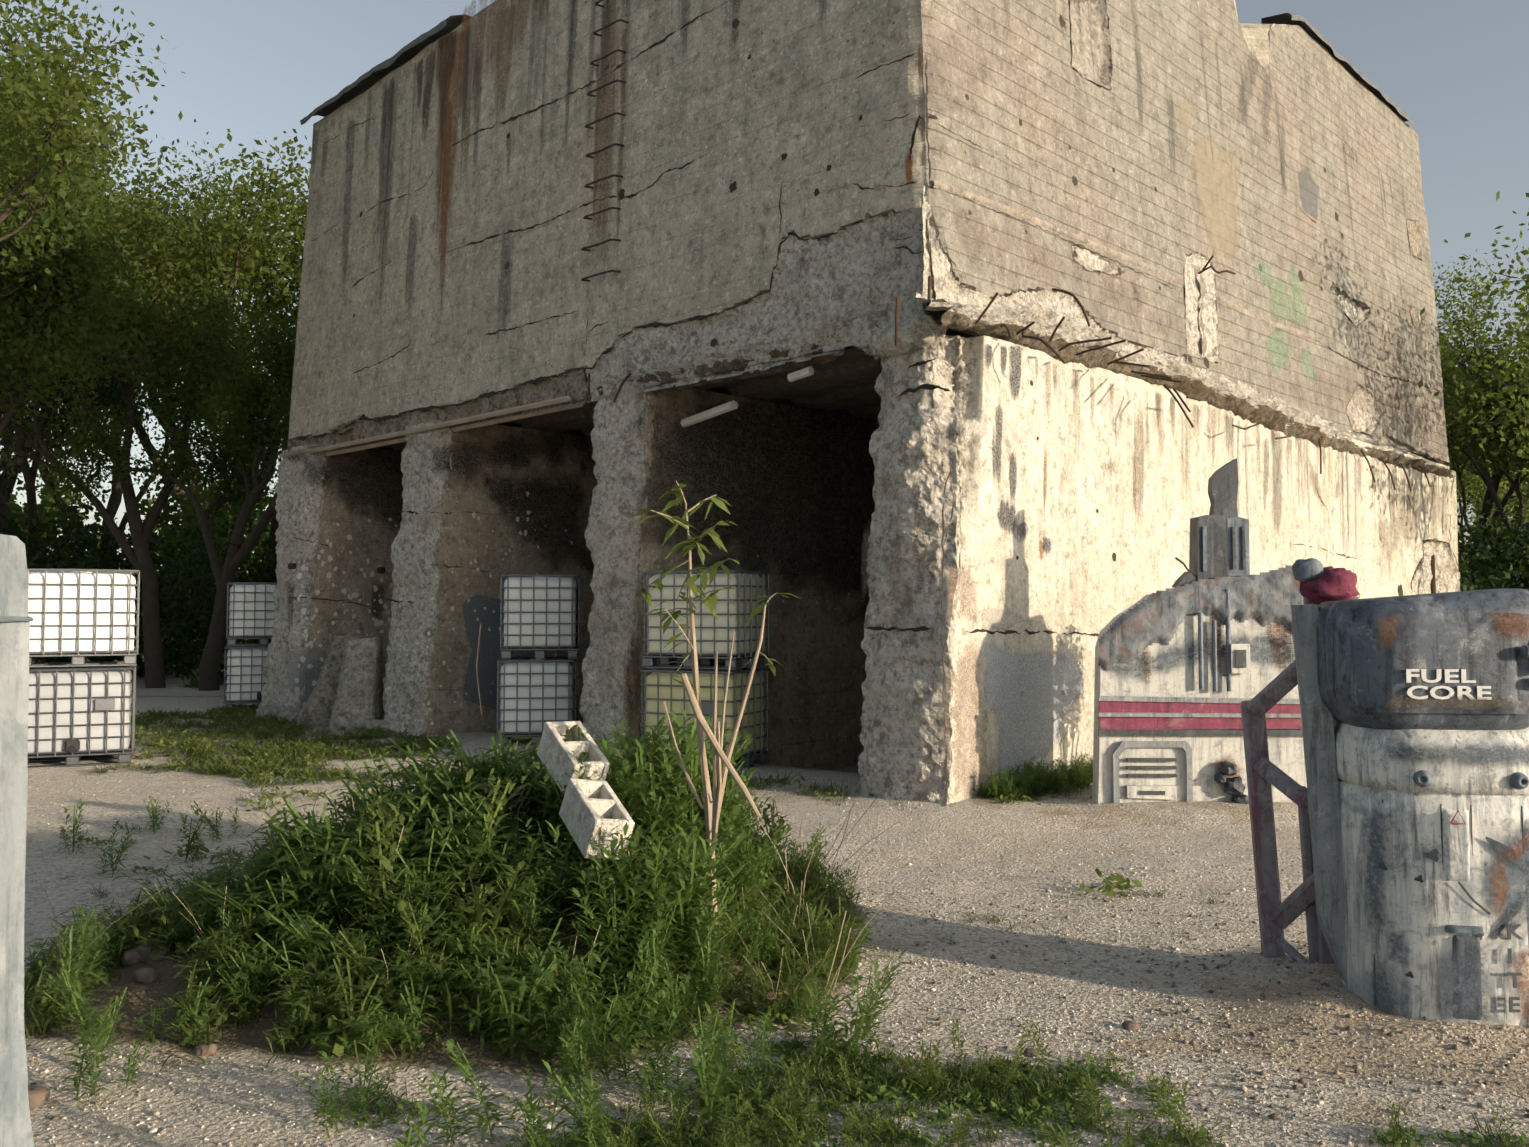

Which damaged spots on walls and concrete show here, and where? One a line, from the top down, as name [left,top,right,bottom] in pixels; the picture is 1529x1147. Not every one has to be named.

rust [417,0,546,280]
crack [288,52,1177,441]
spalling [287,186,1209,453]
leakage [986,344,1021,396]
leakage [965,407,1051,553]
spalling [1198,255,1236,275]
spalling [1320,285,1369,326]
spalling [1346,386,1431,491]